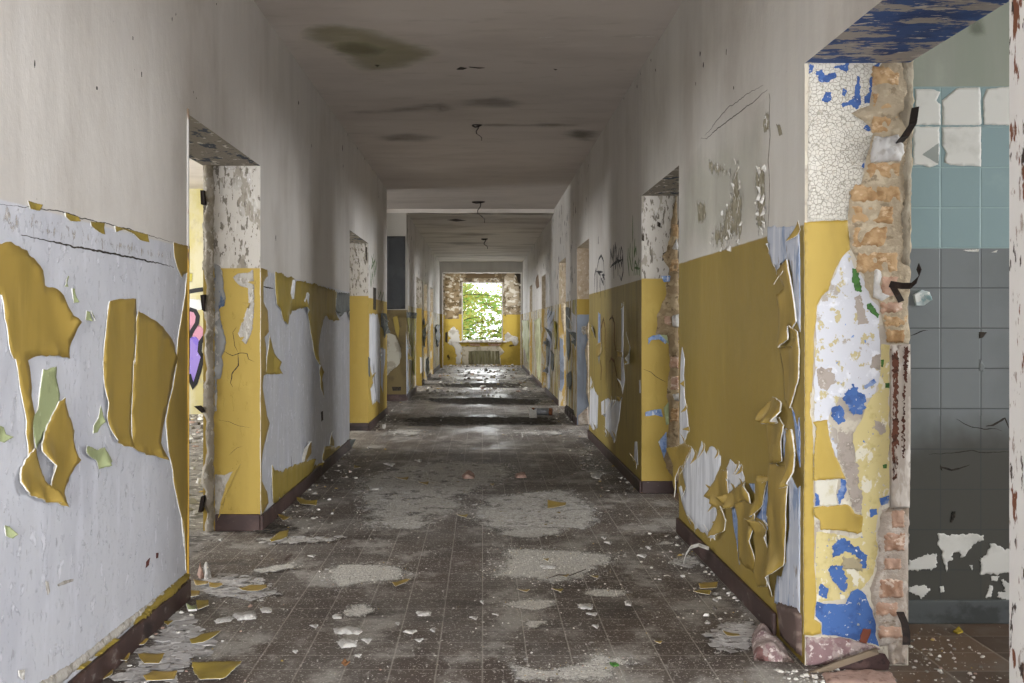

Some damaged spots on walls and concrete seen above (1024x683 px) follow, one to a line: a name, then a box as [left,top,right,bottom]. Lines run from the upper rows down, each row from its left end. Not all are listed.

crack [0,204,174,268]
peeling [0,165,356,683]
crack [224,328,252,387]
peeling [368,273,630,443]
flaking render [645,60,1009,666]